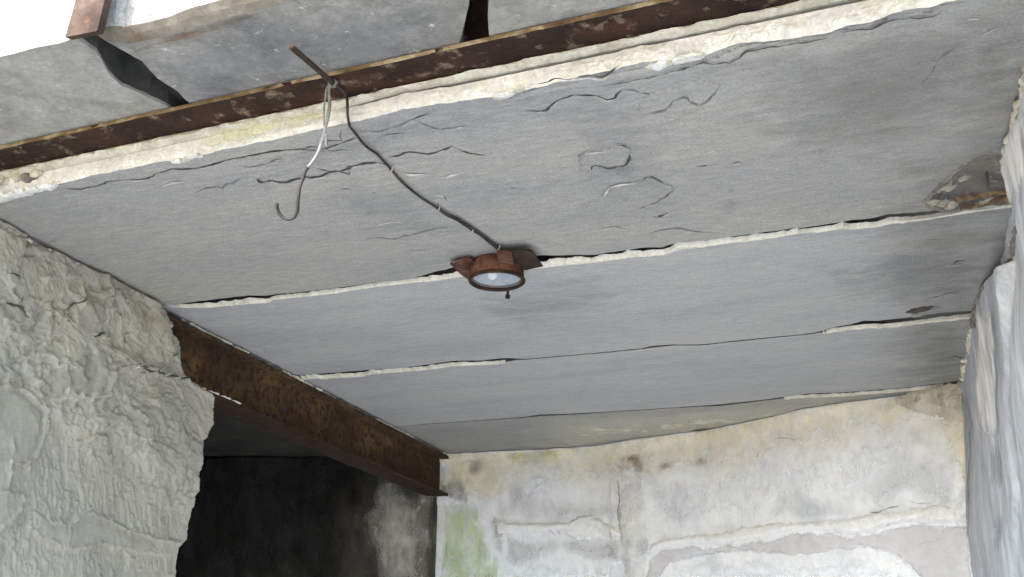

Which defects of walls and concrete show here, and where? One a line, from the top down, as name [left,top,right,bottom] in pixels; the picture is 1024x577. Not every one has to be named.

crack [533,66,650,113]
peeling [170,153,204,164]
crack [61,113,480,193]
spalling [921,65,1024,213]
spalling [0,169,60,203]
crack [366,222,447,251]
peeling [1004,219,1017,264]
peeling [958,279,987,390]
water stain [176,456,362,577]